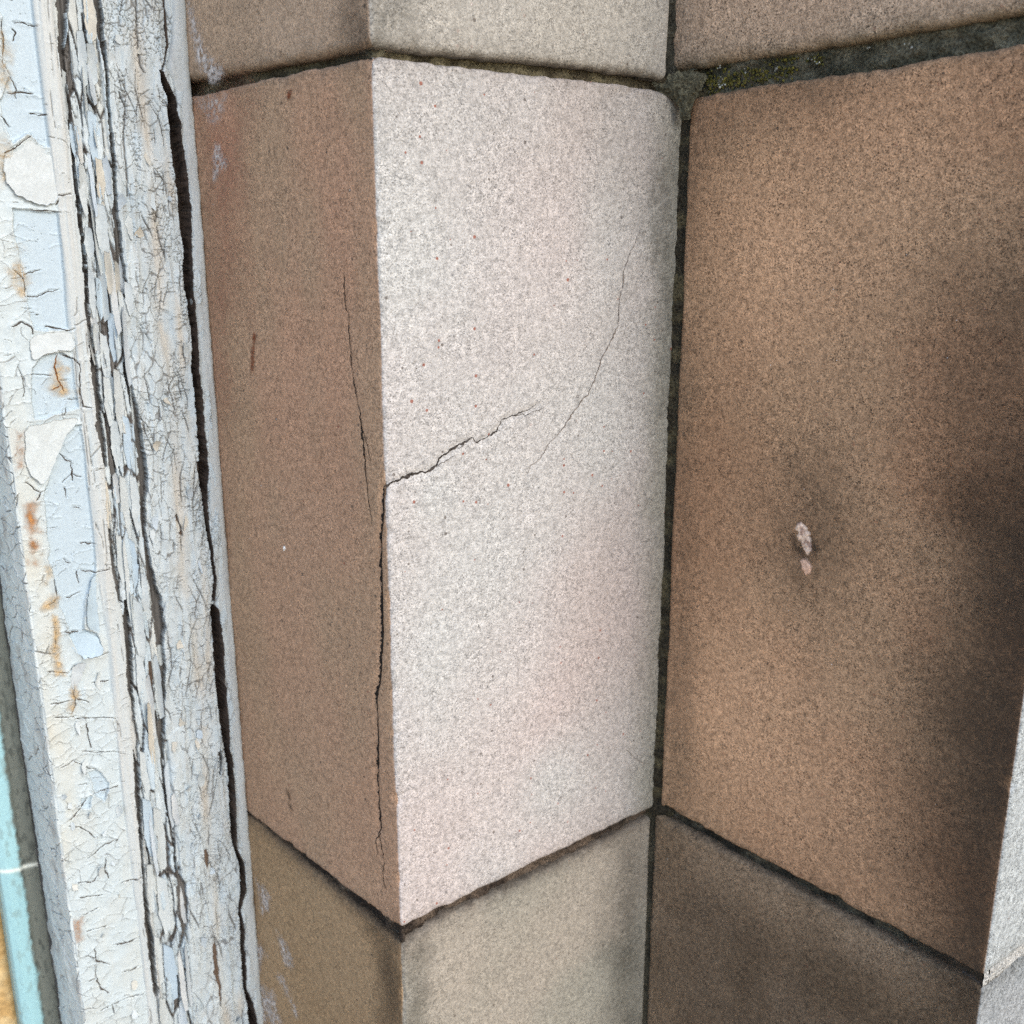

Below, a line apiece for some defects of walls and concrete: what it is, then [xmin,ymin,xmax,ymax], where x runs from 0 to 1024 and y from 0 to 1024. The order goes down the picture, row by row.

peeling [3,140,58,206]
peeling [30,332,75,360]
crack [528,232,640,472]
peeling [24,418,78,484]
peeling [62,0,205,1024]
spalling [795,522,813,576]
crack [343,278,541,889]